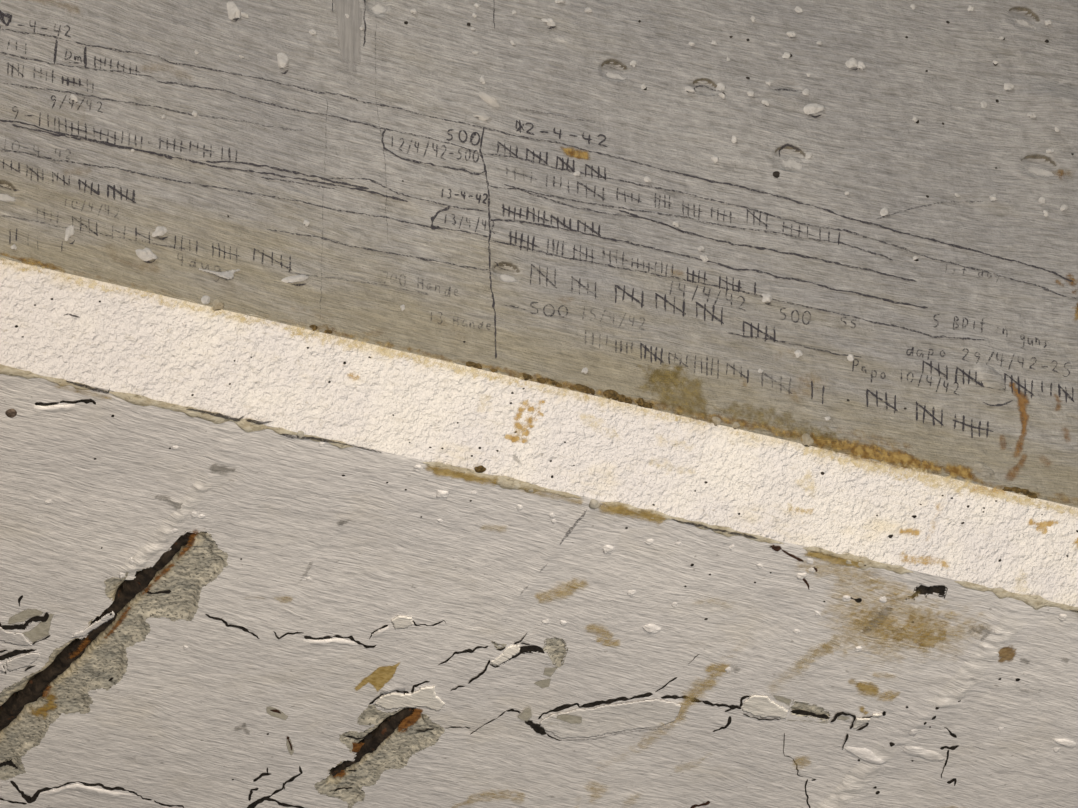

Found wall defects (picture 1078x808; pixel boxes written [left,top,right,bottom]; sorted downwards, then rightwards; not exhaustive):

spalling [0,531,228,780]
crack [205,614,446,650]
crack [369,633,544,705]
crack [449,655,751,741]
crack [0,781,184,808]
crack [247,766,304,808]
spalling [314,686,445,808]
crack [783,733,816,808]
crack [924,707,959,786]